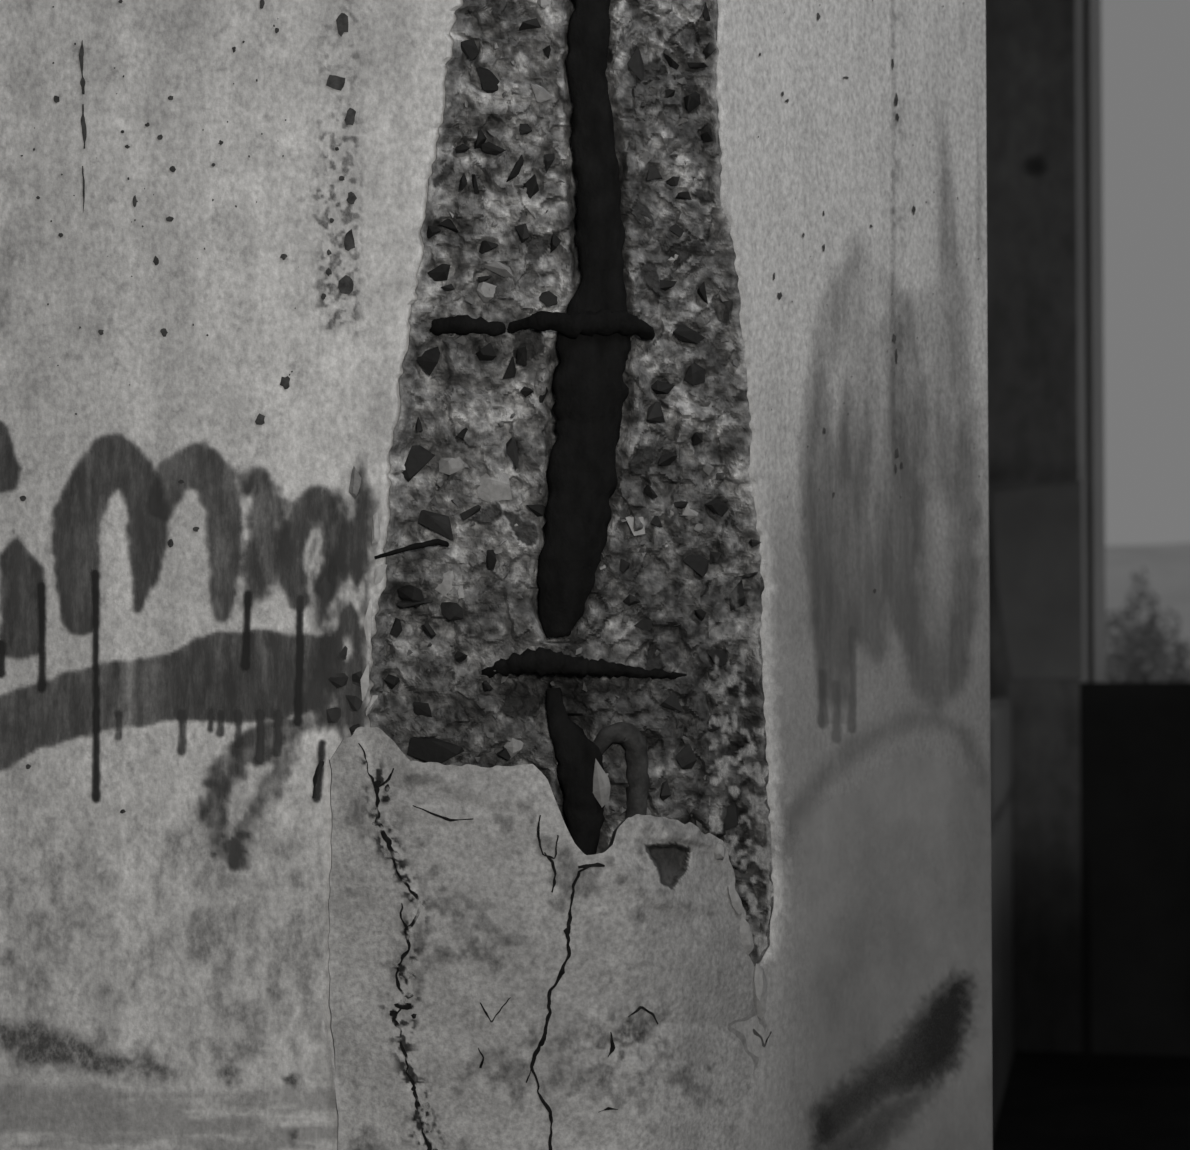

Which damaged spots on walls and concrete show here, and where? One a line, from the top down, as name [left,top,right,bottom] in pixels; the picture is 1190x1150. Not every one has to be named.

spalling [303,0,782,966]
crack [358,743,473,1150]
crack [526,815,605,1150]
crack [608,1006,658,1057]